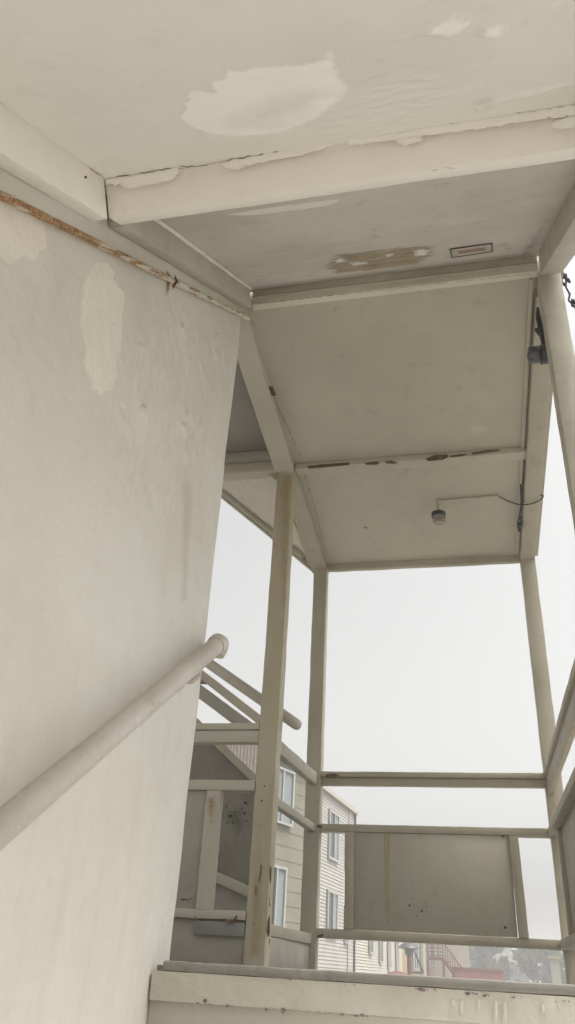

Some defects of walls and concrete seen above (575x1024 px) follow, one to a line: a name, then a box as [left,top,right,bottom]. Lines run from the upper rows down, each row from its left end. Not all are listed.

peeling [178,42,360,138]
peeling [347,104,575,146]
peeling [0,200,48,268]
peeling [77,259,126,397]
peeling [426,450,500,461]